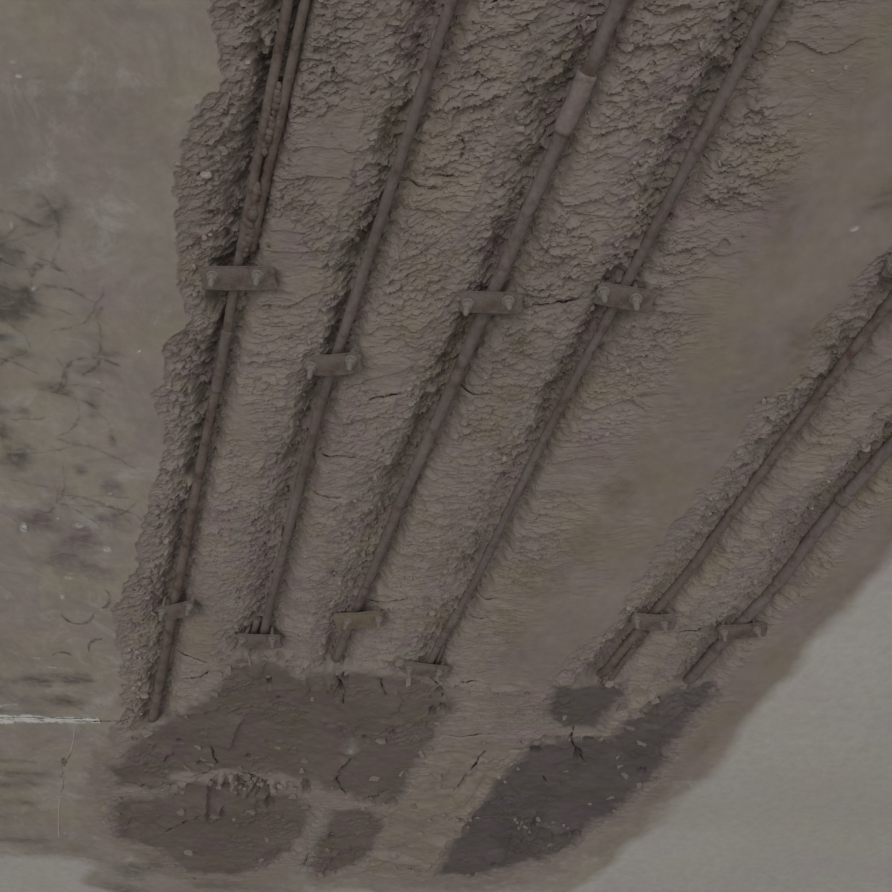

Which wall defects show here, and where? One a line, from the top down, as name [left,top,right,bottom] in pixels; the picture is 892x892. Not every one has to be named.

spalling [108,0,282,746]
spalling [160,0,445,711]
spalling [264,0,892,878]